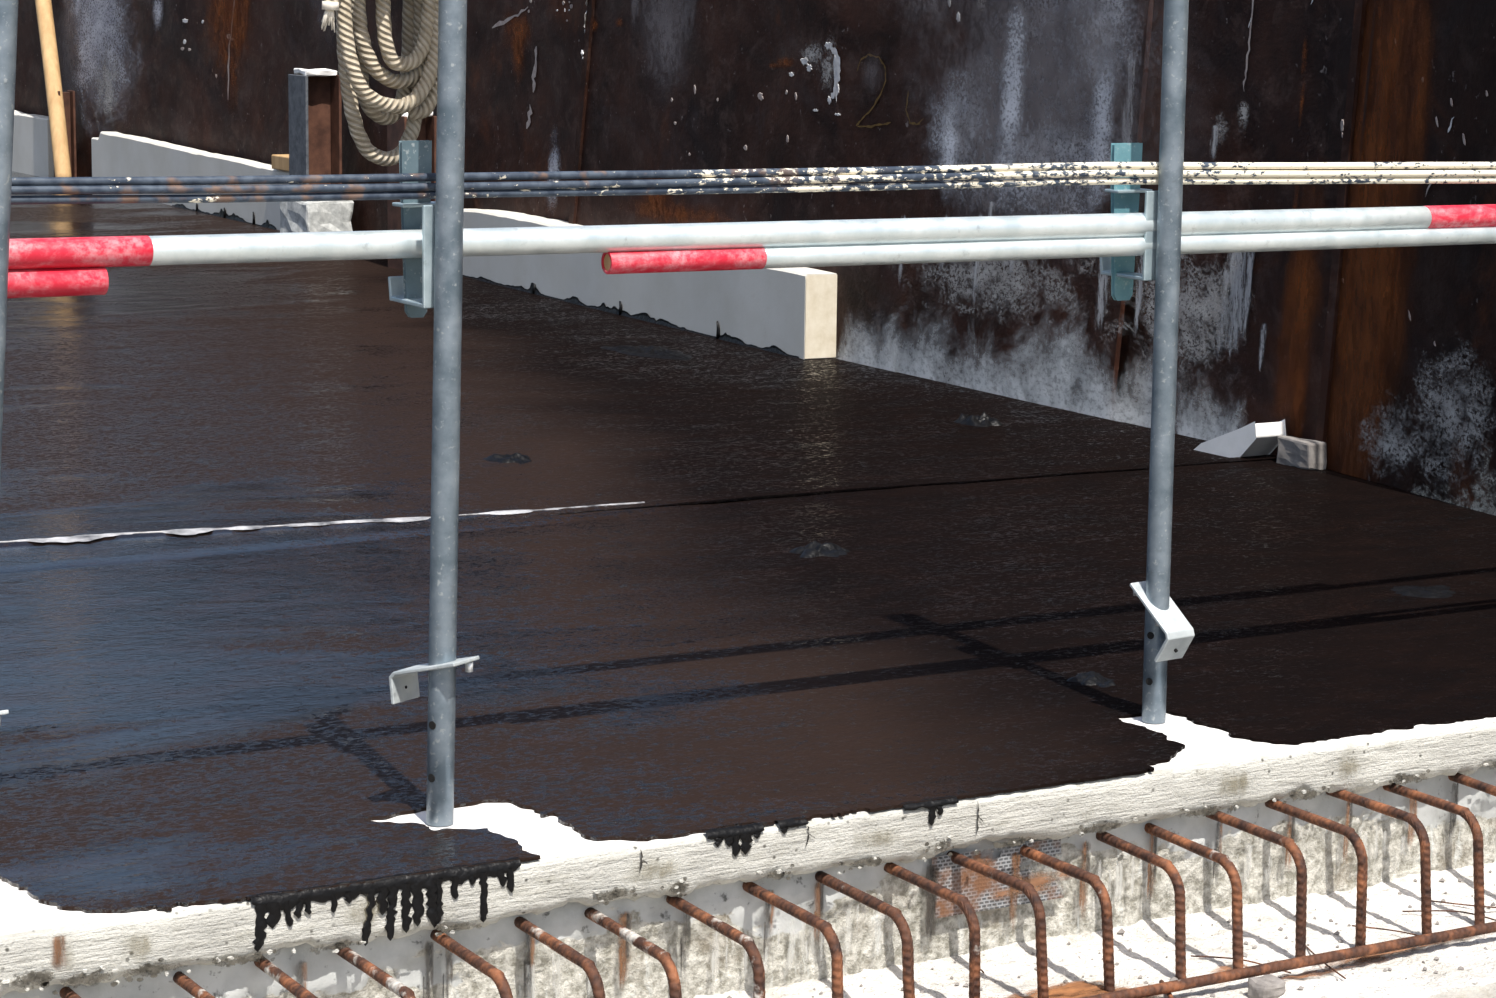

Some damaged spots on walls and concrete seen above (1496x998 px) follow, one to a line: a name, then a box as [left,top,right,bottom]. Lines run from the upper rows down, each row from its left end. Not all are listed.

leakage [1122,52,1135,143]
rust [1349,0,1428,208]
leakage [1097,264,1108,325]
leakage [1135,256,1143,326]
leakage [1190,252,1266,368]
rust [1329,247,1409,479]
rust [814,881,824,936]
rust [995,842,1090,924]
rust [1147,835,1157,897]
rust [619,912,631,985]
rust [991,981,1162,998]
rust [1278,937,1468,978]